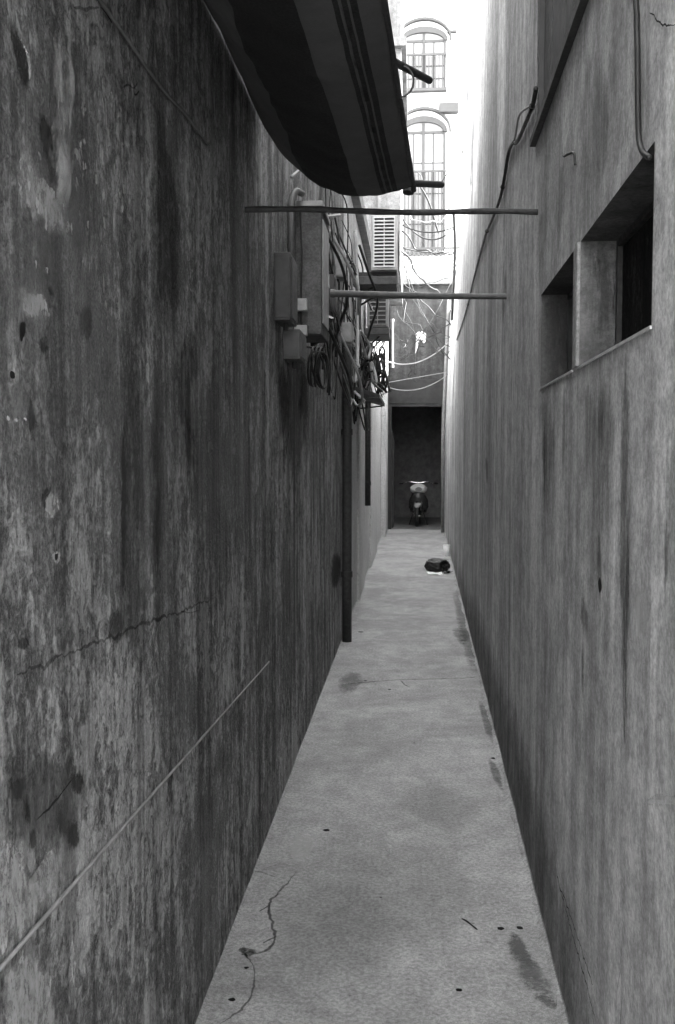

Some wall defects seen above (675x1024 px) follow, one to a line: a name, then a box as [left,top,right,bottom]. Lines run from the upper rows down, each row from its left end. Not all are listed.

crack [17,601,209,675]
leakage [7,750,83,851]
leakage [466,603,567,1008]
crack [224,871,294,1022]